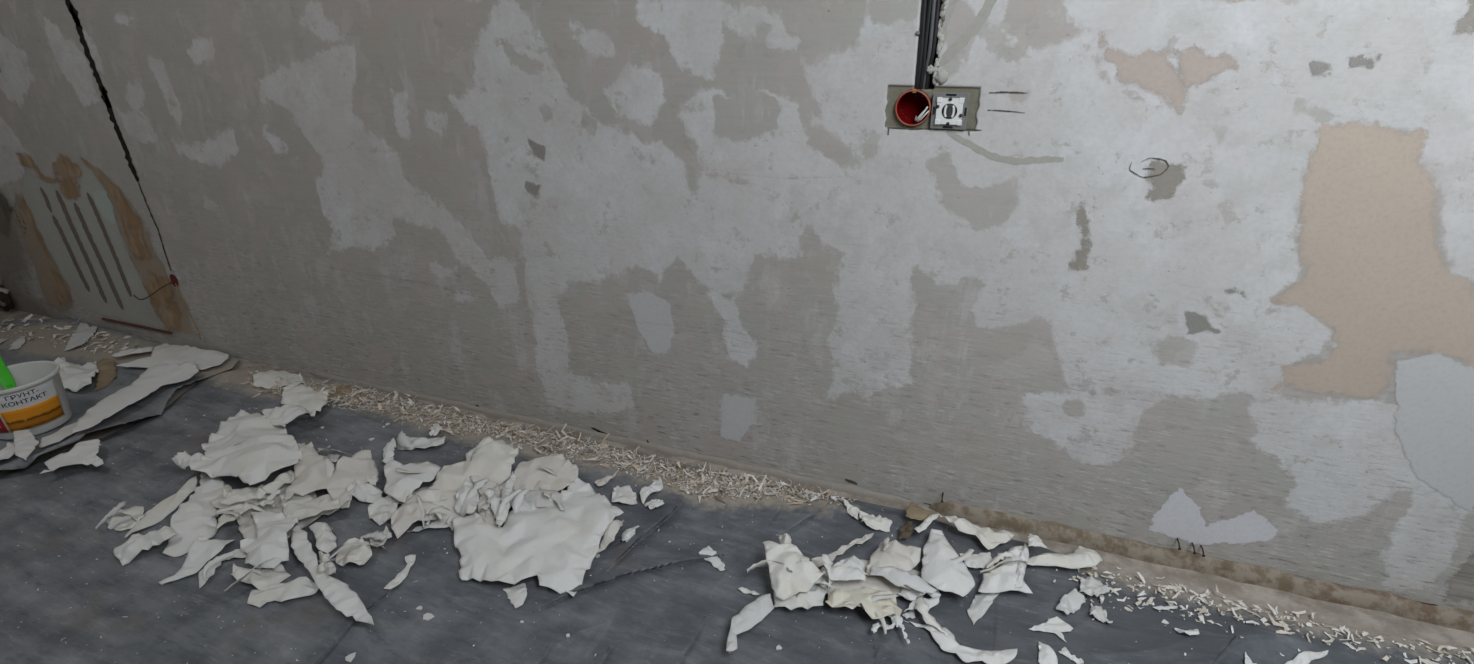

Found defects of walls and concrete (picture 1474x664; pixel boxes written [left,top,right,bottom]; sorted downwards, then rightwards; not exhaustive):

peeling [1095,28,1243,115]
crack [65,0,171,271]
spalling [0,291,14,312]
peeling [1443,542,1474,605]